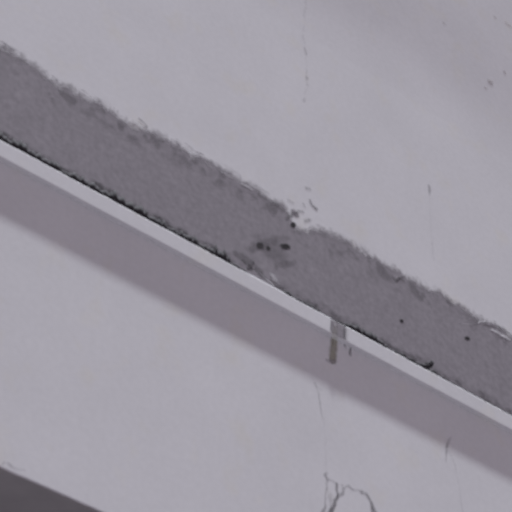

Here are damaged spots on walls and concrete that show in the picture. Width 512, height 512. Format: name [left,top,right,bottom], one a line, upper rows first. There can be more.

peeling [0,43,512,415]